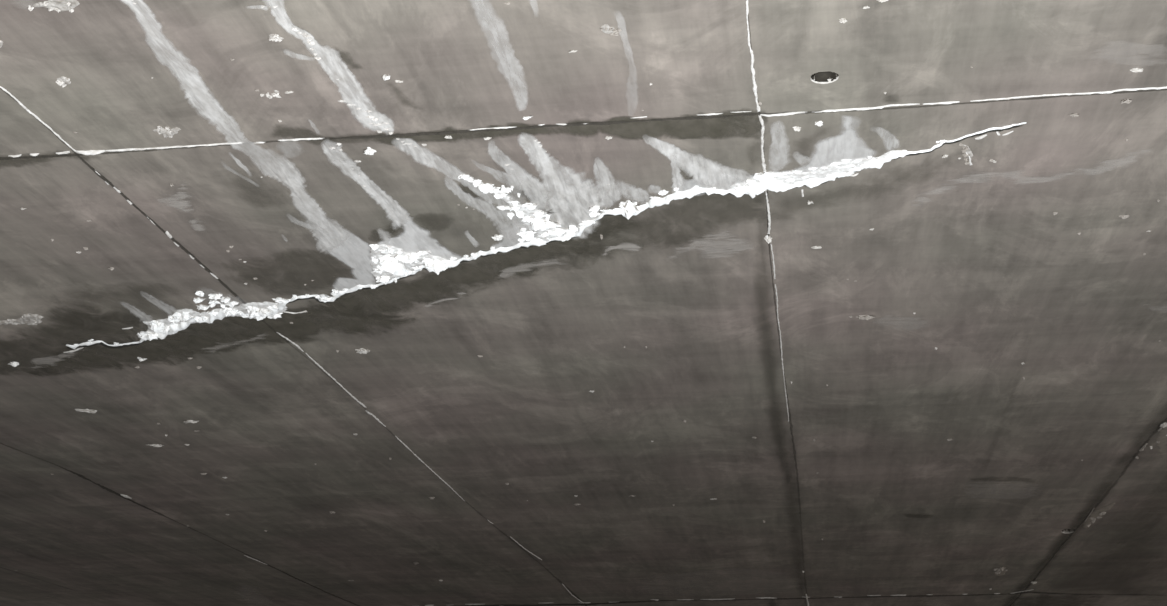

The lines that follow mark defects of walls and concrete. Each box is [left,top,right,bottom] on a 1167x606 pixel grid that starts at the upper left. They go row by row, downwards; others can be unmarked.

leakage [0,0,907,374]
crack [63,122,1026,353]